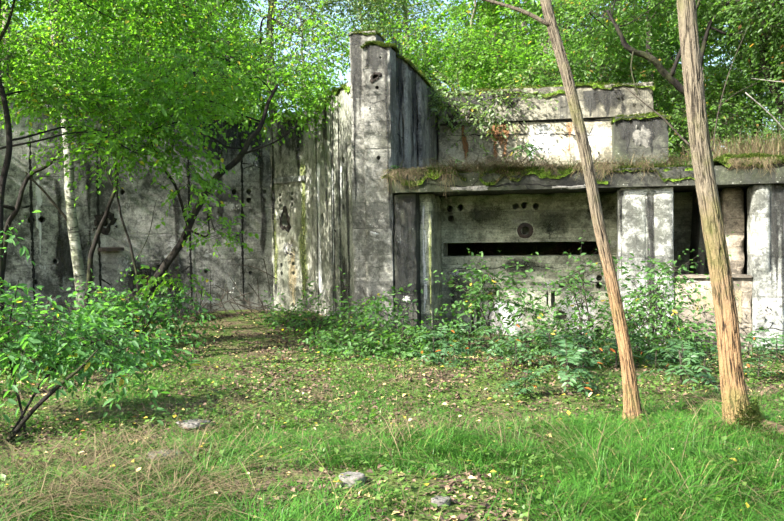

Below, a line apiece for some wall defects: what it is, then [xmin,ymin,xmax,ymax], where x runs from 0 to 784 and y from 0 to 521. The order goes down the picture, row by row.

rust [490,123,520,159]
leakage [583,89,662,158]
spalling [632,125,653,148]
leakage [316,34,417,318]
leakage [387,163,431,324]